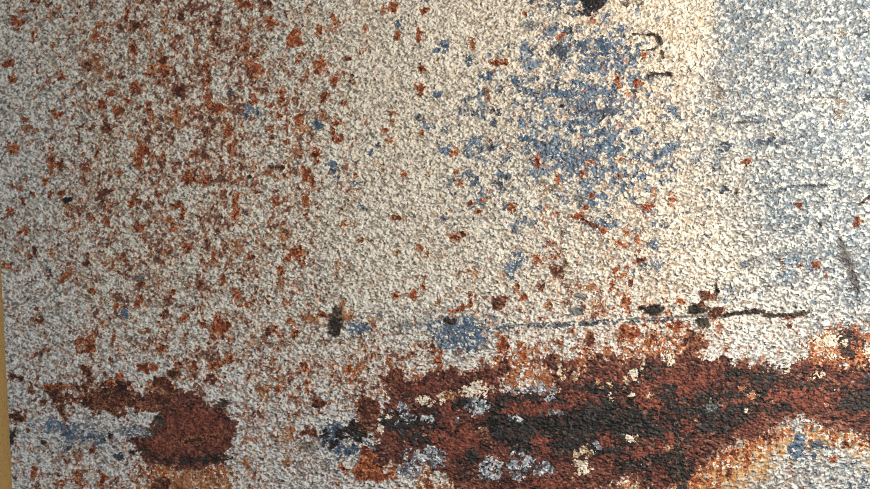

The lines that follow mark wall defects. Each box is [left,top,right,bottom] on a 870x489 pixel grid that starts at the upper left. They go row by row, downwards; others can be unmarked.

rust [77,21,188,174]
rust [174,19,236,185]
rust [239,22,357,212]
rust [5,147,65,214]
rust [165,200,185,234]
rust [261,226,319,308]
rust [264,309,328,341]
rust [431,267,479,315]
rust [484,280,528,311]
rust [532,240,563,312]
rust [609,231,647,310]
rust [327,291,870,489]